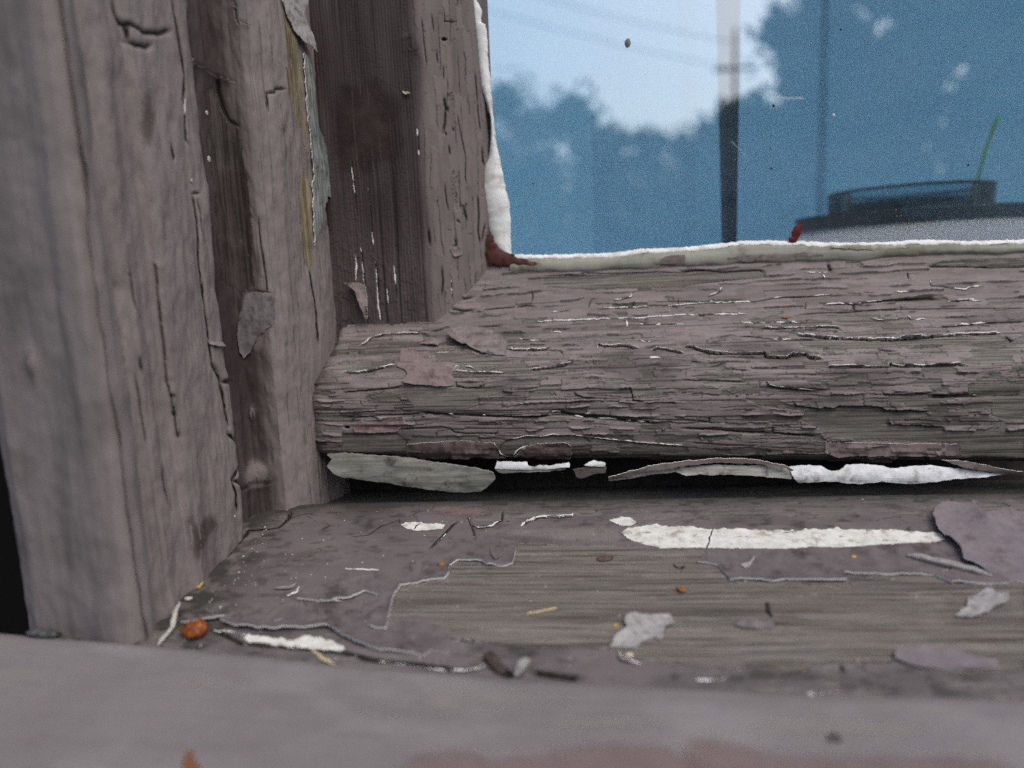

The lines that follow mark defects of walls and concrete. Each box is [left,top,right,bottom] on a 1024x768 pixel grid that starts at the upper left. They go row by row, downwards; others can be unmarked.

peeling [282,0,331,272]
crack [428,74,491,246]
crack [191,192,232,439]
peeling [207,88,276,358]
peeling [344,283,368,321]
peeling [342,325,573,411]
peeling [660,252,823,285]
peeling [597,325,1000,368]
peeling [933,258,1023,268]
peeling [342,382,1024,484]
peeling [181,500,1024,673]